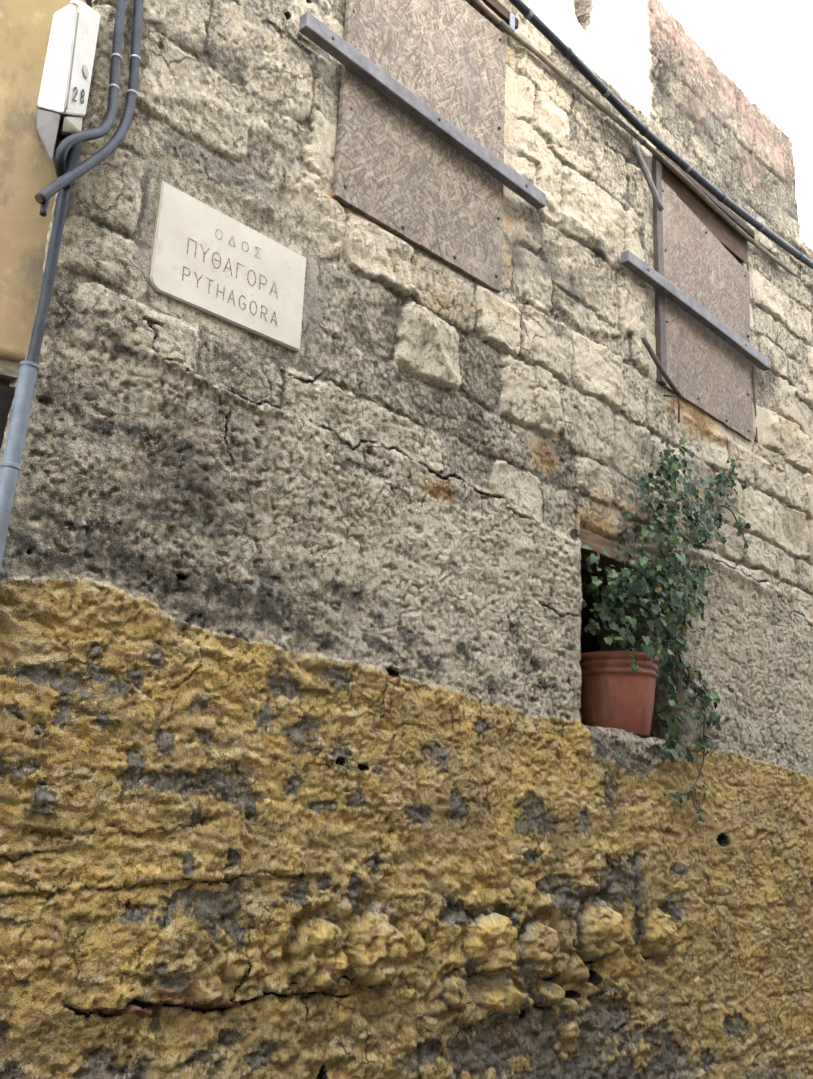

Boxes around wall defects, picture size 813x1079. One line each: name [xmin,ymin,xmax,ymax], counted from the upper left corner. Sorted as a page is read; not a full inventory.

crack [143,319,197,374]
crack [281,372,316,384]
crack [224,391,270,461]
spalling [187,694,219,716]
spalling [117,729,265,834]
spalling [114,845,257,955]
spalling [146,961,191,994]
crack [66,937,411,1020]
spalling [63,1043,147,1079]
spalling [176,1028,281,1073]
spalling [391,984,718,1079]
spalling [715,1008,749,1042]